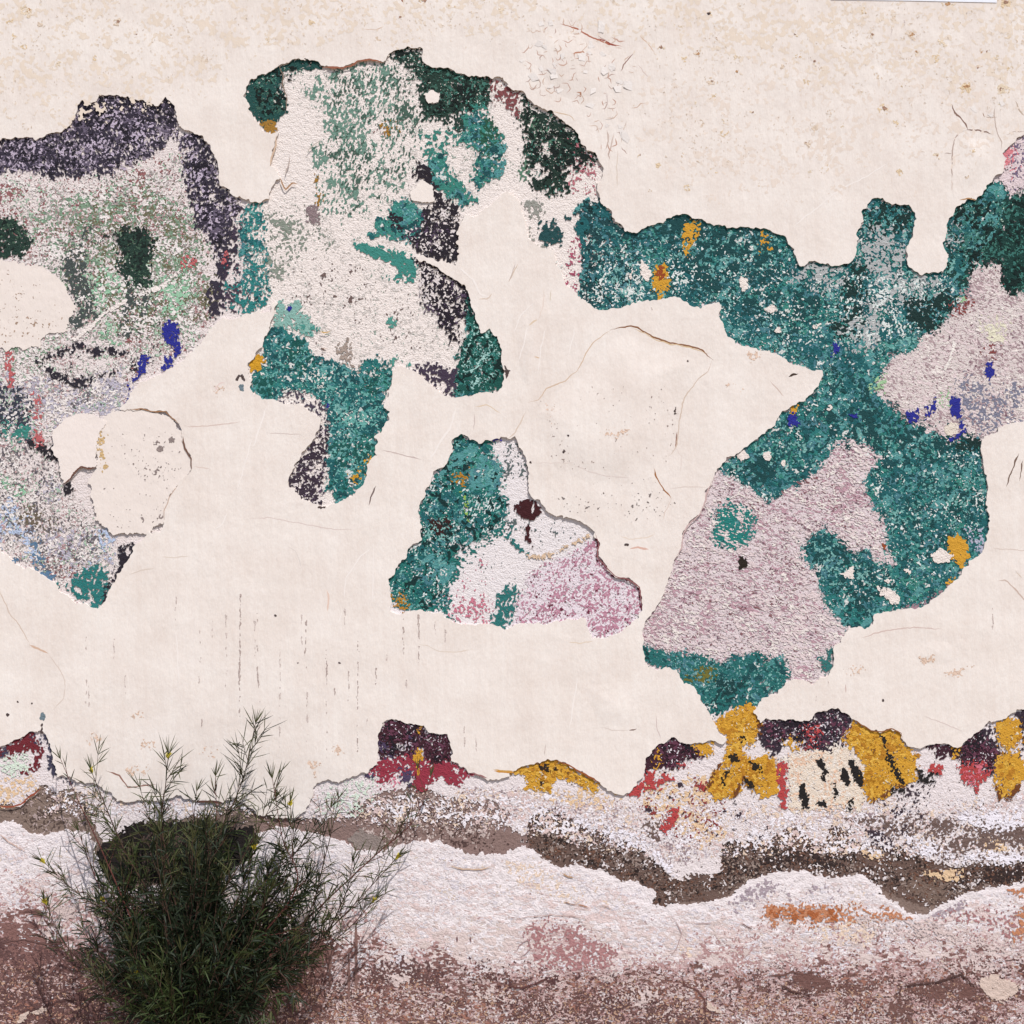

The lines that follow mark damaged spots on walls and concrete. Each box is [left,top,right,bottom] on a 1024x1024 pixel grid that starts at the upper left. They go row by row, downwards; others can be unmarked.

peeling [0,47,1024,718]
crack [621,328,712,550]
peeling [0,785,99,840]
peeling [257,787,1024,908]
peeling [17,1006,47,1023]
spalling [792,969,865,996]
spalling [884,974,1021,1024]